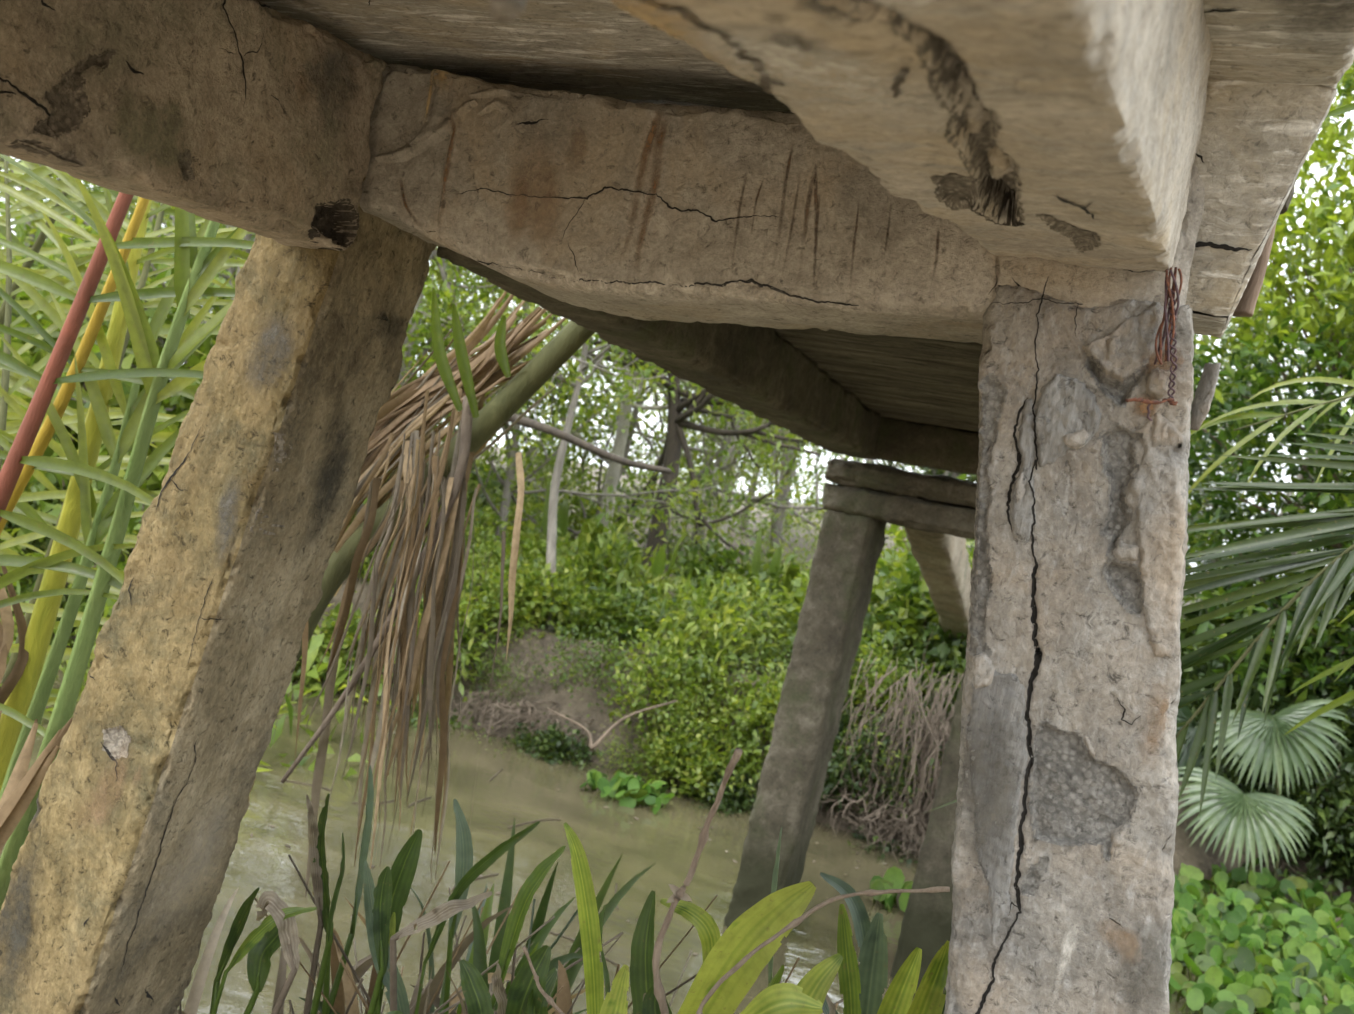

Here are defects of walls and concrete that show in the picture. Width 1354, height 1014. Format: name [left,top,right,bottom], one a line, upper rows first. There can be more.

crack [0,77,50,126]
crack [638,0,785,94]
crack [890,69,910,98]
spalling [301,199,359,251]
crack [453,186,859,306]
flaking render [1011,302,1221,659]
crack [975,278,1083,1014]
spalling [964,373,1139,934]
crack [115,740,197,1006]